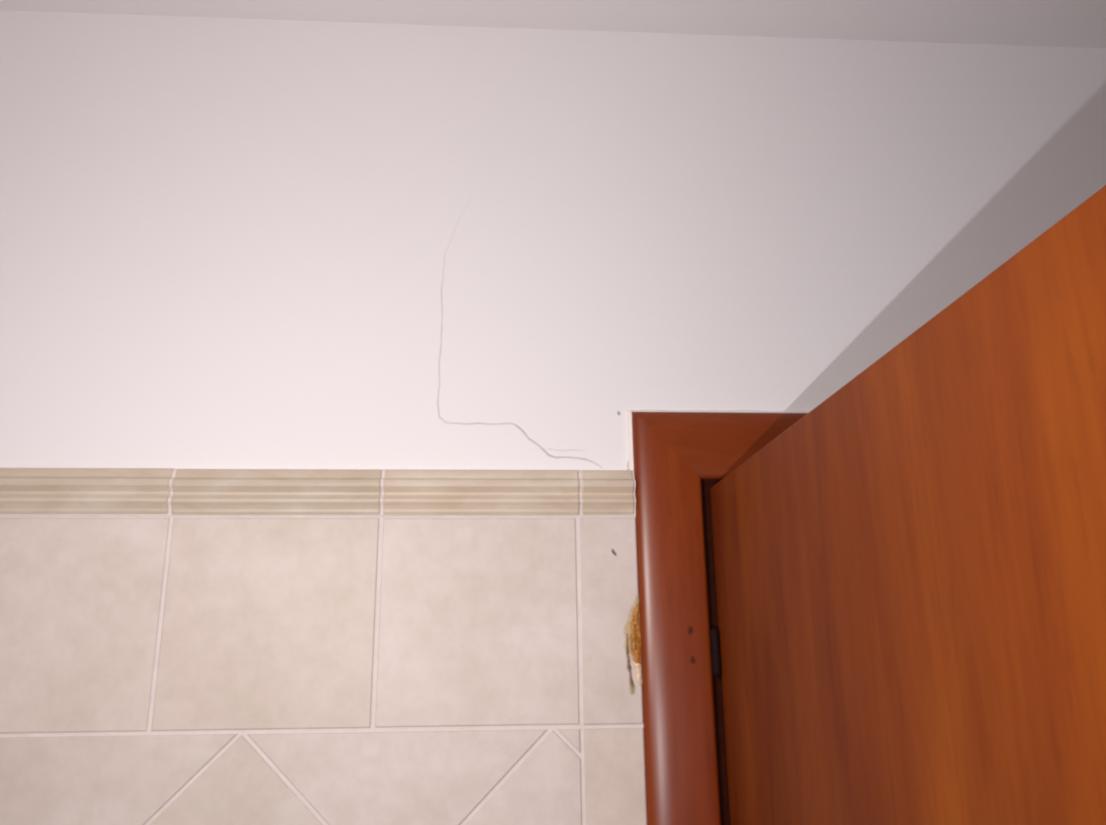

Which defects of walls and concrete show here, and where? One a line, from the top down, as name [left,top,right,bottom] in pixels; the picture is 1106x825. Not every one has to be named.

peeling [634,662,642,684]